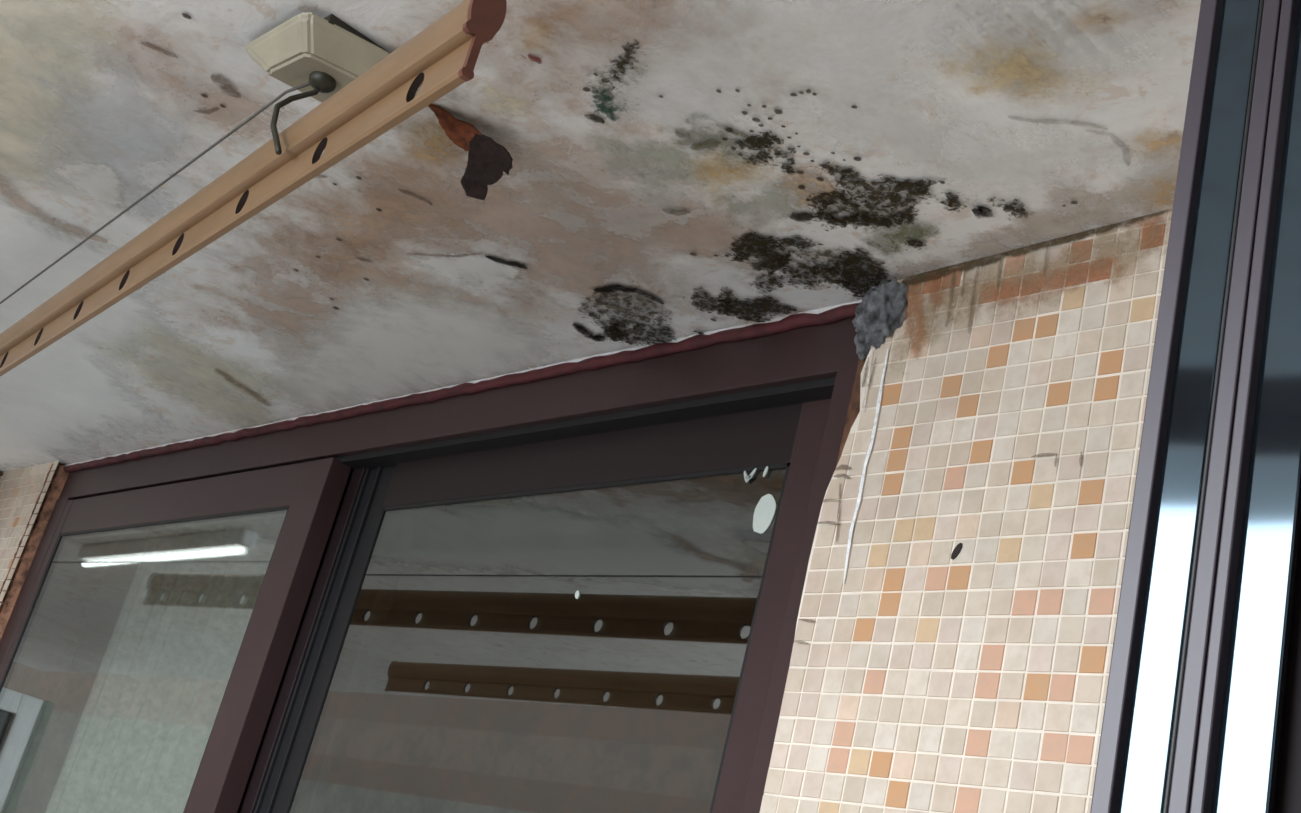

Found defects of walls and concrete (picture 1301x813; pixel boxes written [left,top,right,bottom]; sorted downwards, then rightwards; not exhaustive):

water stain [0,0,110,177]
water stain [583,39,647,124]
water stain [128,336,269,426]
peeling [226,104,752,413]
water stain [572,284,676,346]
water stain [611,89,1179,335]